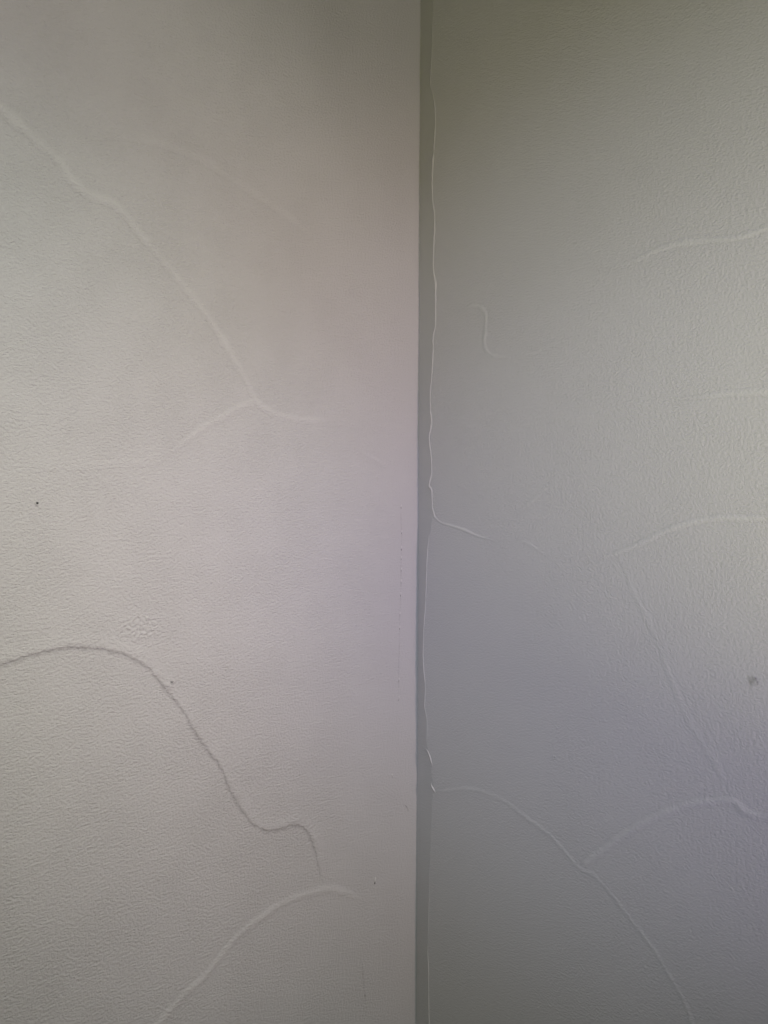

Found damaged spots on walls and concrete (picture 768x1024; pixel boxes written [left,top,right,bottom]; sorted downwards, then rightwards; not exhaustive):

crack [422,7,548,794]